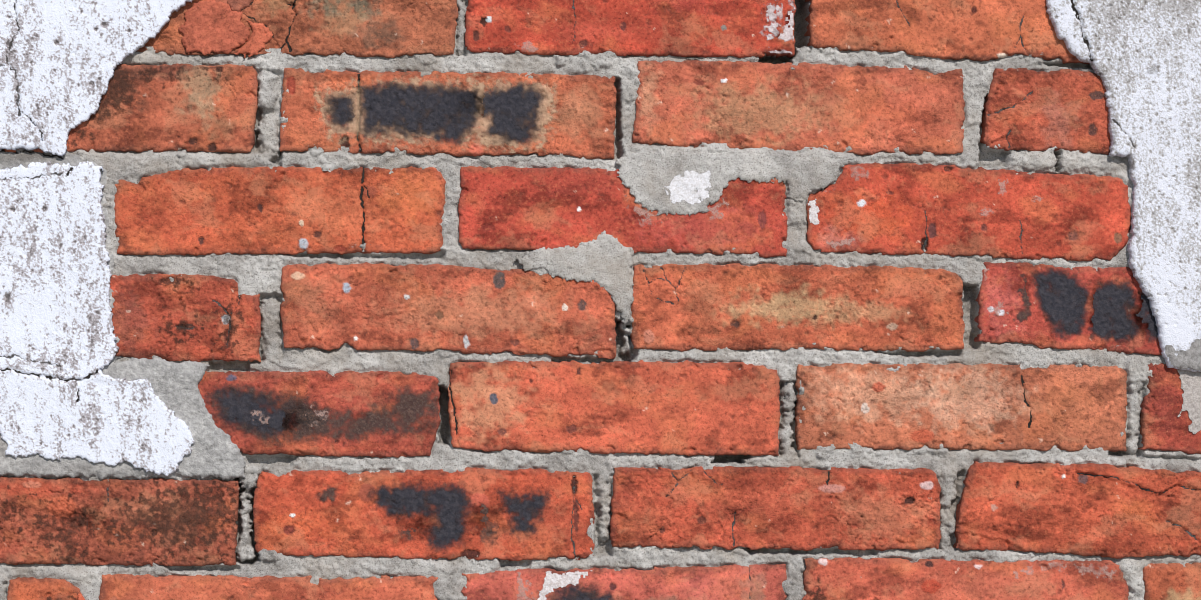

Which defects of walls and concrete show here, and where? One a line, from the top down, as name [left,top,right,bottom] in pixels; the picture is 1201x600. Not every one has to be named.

spalling [178,0,273,58]
crack [241,0,297,52]
peeling [761,3,796,54]
crack [0,0,73,180]
spalling [0,148,115,309]
peeling [808,199,820,225]
flaking render [1165,339,1201,370]
flaking render [0,336,246,480]
peeling [537,570,593,600]